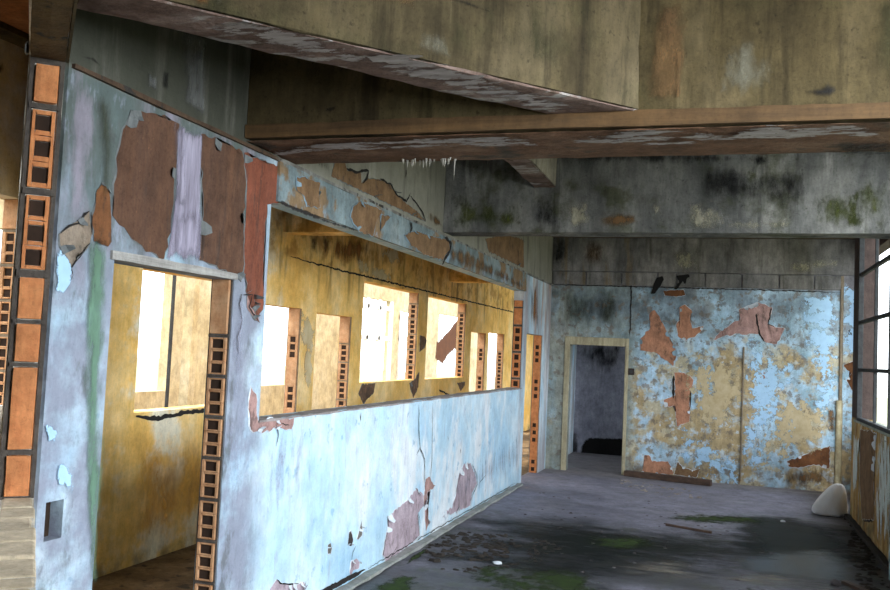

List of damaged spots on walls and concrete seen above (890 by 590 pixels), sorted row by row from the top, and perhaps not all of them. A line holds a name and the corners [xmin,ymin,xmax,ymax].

peeling [213,16,568,111]
peeling [573,125,878,145]
peeling [58,110,179,266]
peeling [198,133,535,322]
mould [706,172,755,197]
crack [291,256,513,312]
peeling [639,289,704,427]
spalling [136,339,223,590]
peeling [382,477,436,562]
peeling [442,462,477,518]
water stain [440,517,871,576]
peeling [787,446,831,469]